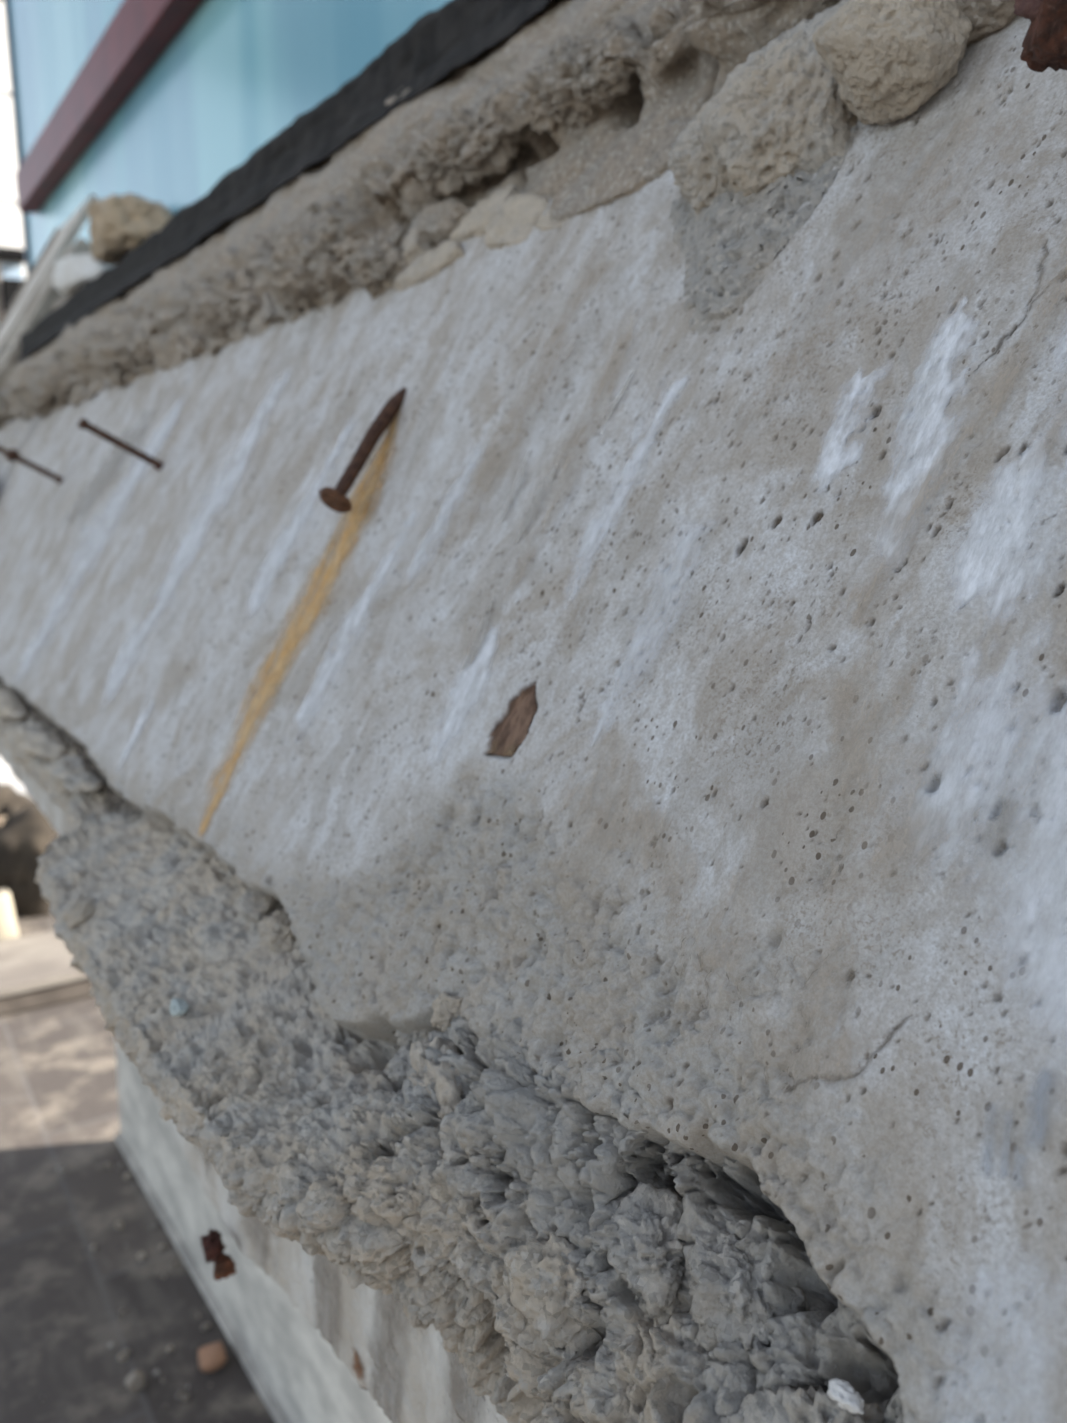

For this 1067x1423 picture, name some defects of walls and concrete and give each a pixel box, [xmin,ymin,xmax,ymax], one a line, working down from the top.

spalling [0,0,858,429]
spalling [956,0,1017,48]
rust [1014,0,1042,22]
rust [200,413,398,834]
rust [486,682,538,757]
spalling [0,678,903,1423]